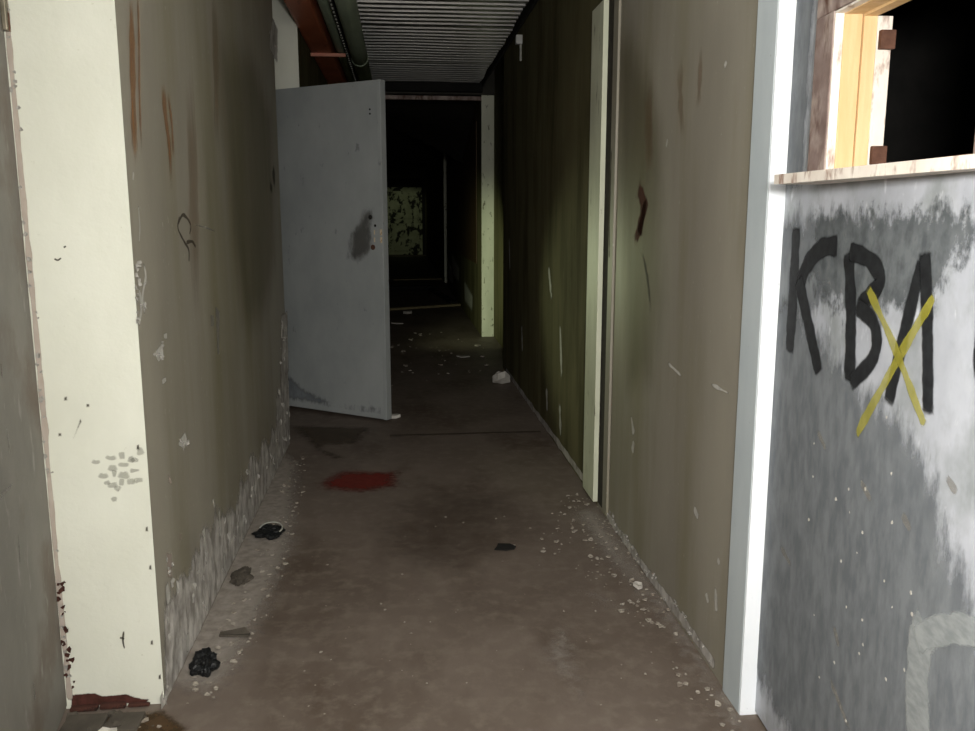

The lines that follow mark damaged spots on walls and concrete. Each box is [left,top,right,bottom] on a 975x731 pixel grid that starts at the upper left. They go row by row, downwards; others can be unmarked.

corrosion [129,4,141,145]
corrosion [162,93,174,164]
peeling [57,322,290,731]